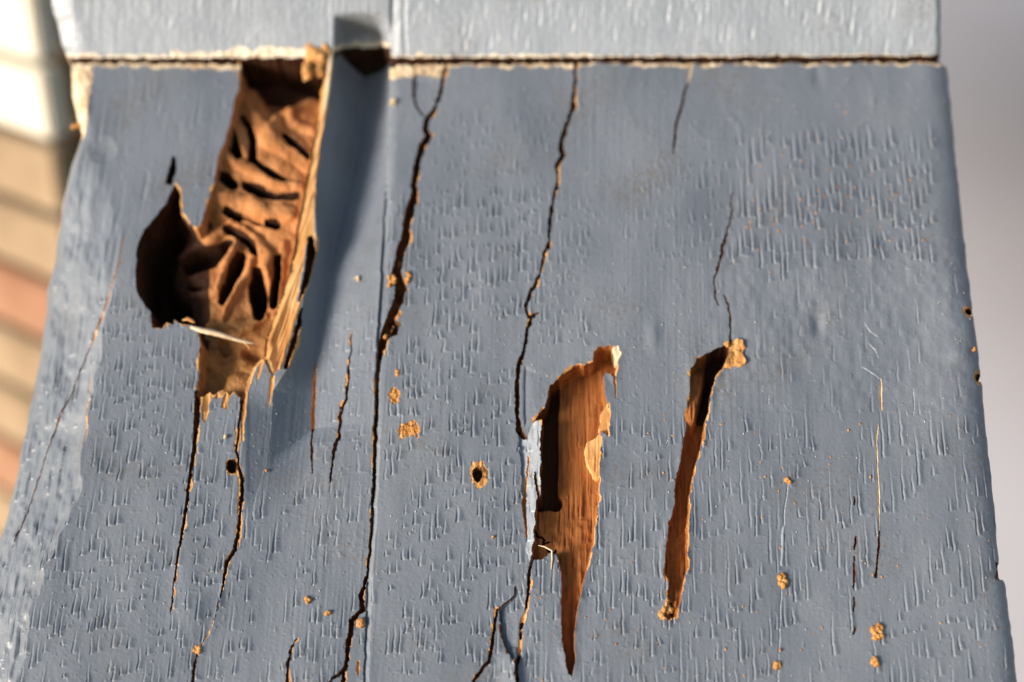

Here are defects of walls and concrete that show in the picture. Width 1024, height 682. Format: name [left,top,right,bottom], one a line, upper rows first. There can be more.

crack [672,64,692,154]
spalling [135,42,333,442]
crack [310,65,449,682]
crack [514,63,580,433]
crack [713,193,733,344]
crack [169,389,203,615]
crack [191,398,245,682]
crack [472,530,557,682]
peeling [515,421,542,565]